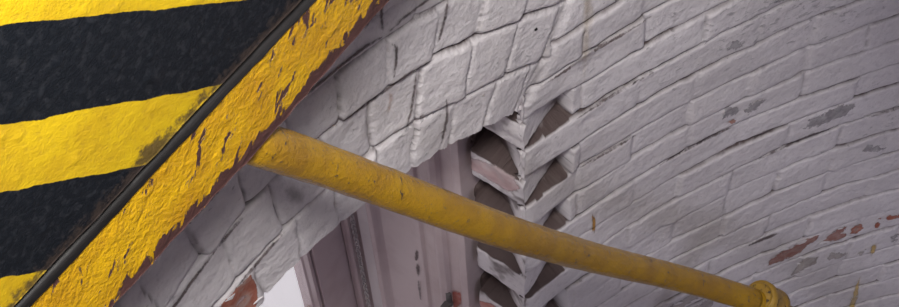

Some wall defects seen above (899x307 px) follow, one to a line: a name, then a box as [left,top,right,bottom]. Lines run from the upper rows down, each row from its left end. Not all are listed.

peeling [769,224,863,276]
flaking render [221,275,263,307]